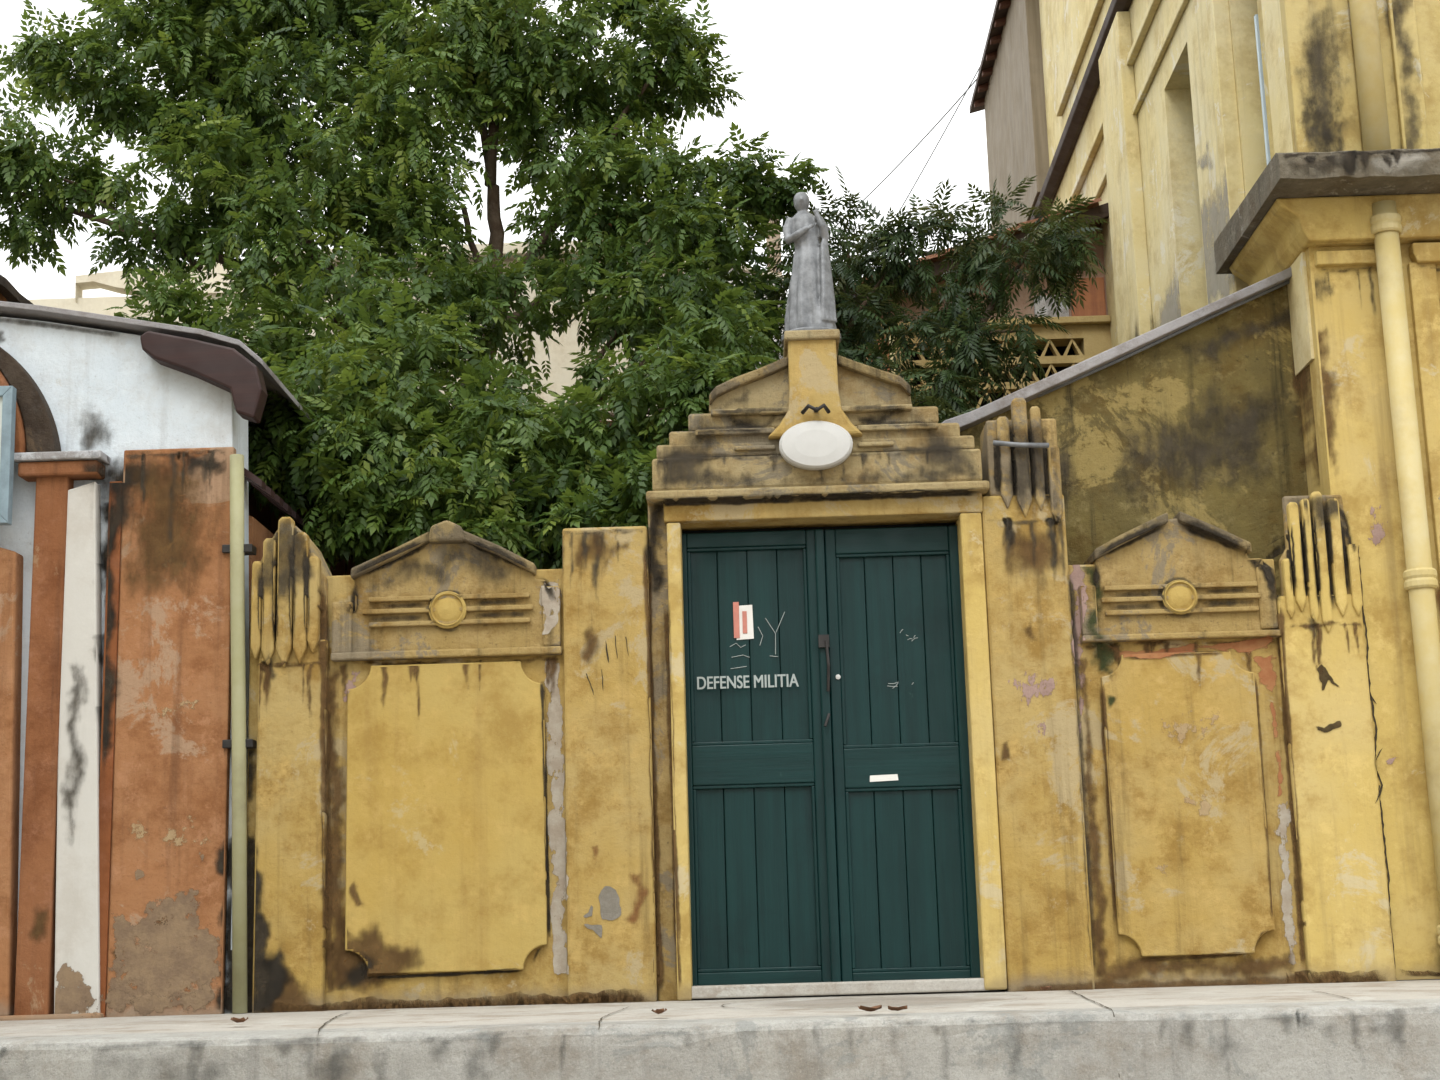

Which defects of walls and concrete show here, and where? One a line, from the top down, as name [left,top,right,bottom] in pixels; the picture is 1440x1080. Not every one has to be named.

damp [1285,25,1440,175]
damp [1386,0,1412,75]
damp [994,427,1071,500]
damp [1123,396,1272,489]
peeling [539,580,562,635]
damp [216,523,643,1013]
peeling [544,661,569,974]
damp [643,398,974,988]
peeling [1008,672,1055,705]
damp [1005,497,1380,991]
spalling [54,888,221,1017]
spalling [584,886,621,938]